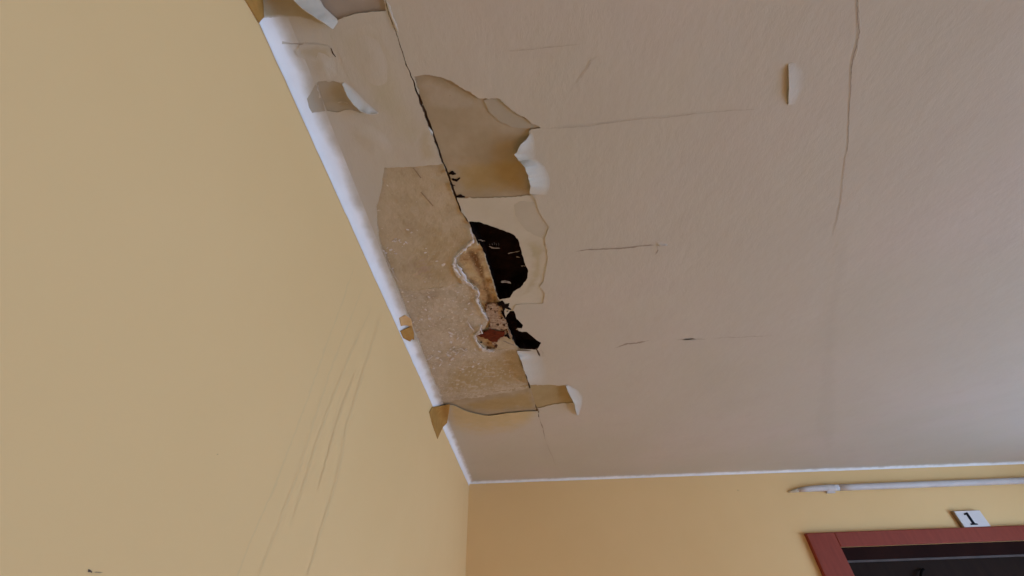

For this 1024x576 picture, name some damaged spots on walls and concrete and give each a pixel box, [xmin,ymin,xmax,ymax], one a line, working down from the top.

peeling [294,0,386,29]
peeling [307,81,378,115]
water stain [263,0,530,197]
crack [385,0,469,223]
peeling [785,62,804,105]
crack [833,0,861,234]
peeling [376,75,583,441]
crack [574,241,668,256]
rust [478,328,505,342]